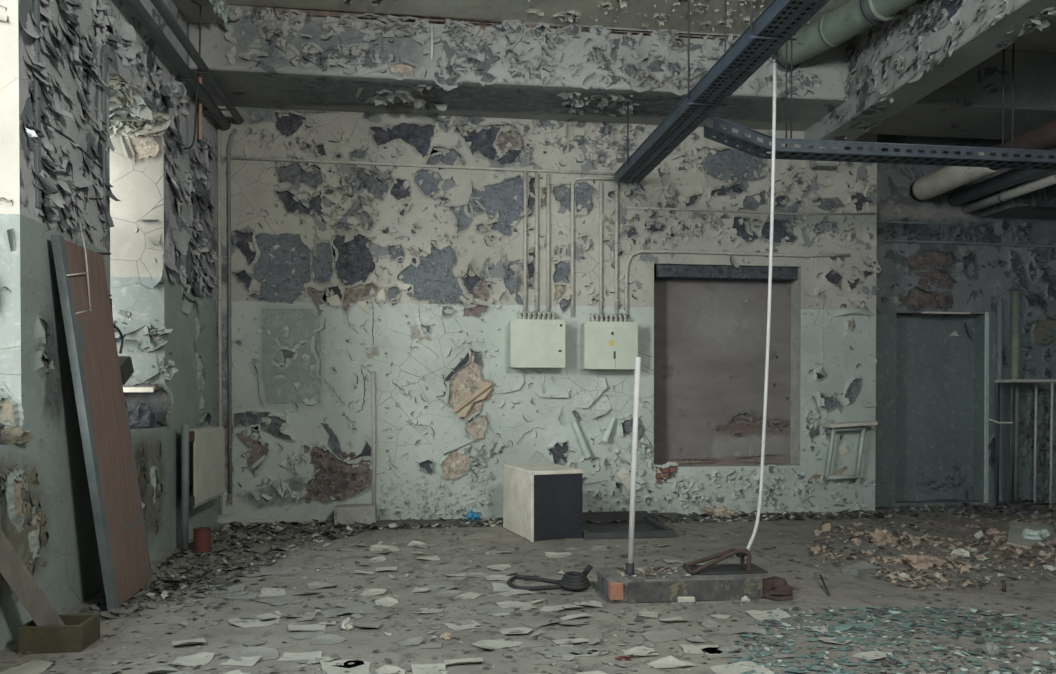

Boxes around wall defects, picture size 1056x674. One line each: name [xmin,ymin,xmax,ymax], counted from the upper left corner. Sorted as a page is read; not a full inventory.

crack [244,120,456,240]
crack [232,150,712,507]
peeling [18,0,1056,537]
crack [712,228,760,268]
crack [760,163,873,216]